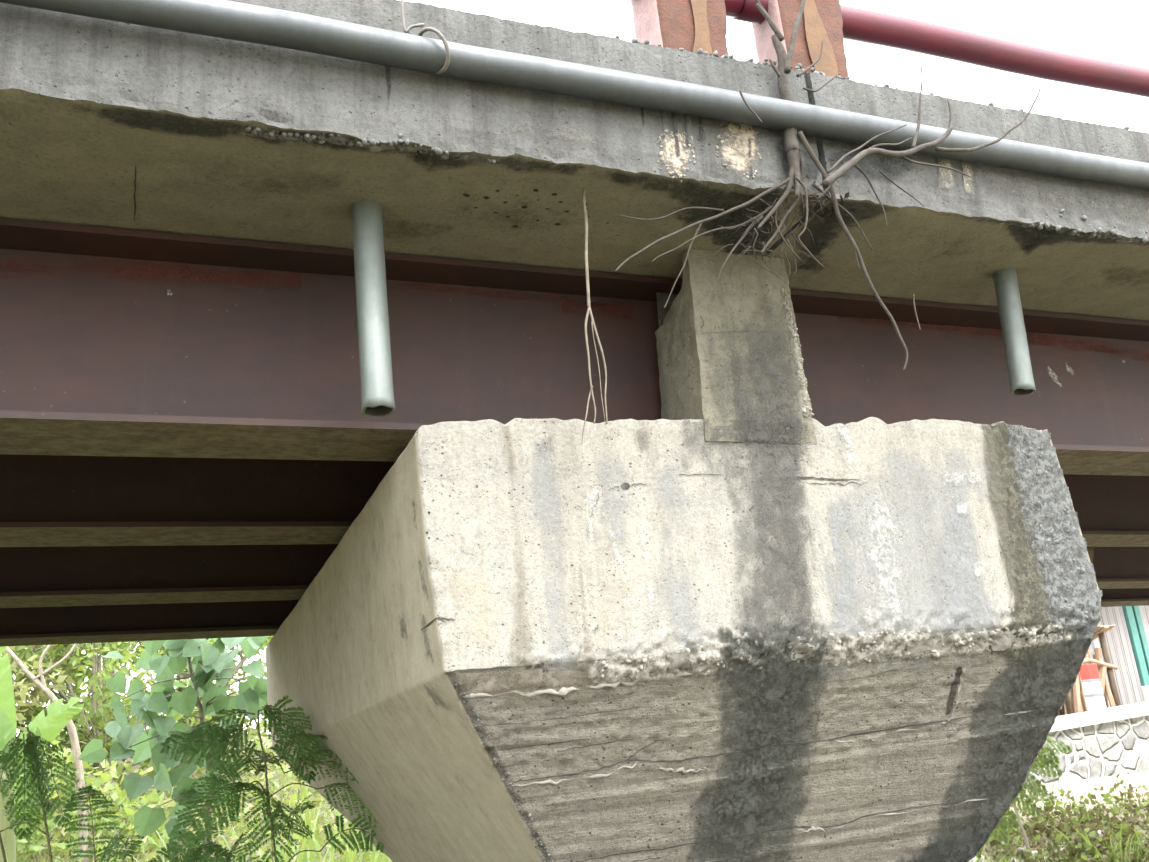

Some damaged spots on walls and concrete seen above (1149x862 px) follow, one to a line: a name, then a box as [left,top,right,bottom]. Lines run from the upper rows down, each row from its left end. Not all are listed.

water stain [87,109,366,150]
water stain [382,143,474,169]
water stain [497,157,583,173]
spalling [657,111,763,187]
water stain [778,143,910,179]
water stain [611,173,779,255]
water stain [797,199,883,271]
water stain [901,422,1093,862]
spalling [448,539,1076,862]
crack [835,668,921,700]
crack [488,706,1052,786]
crack [577,790,1014,862]